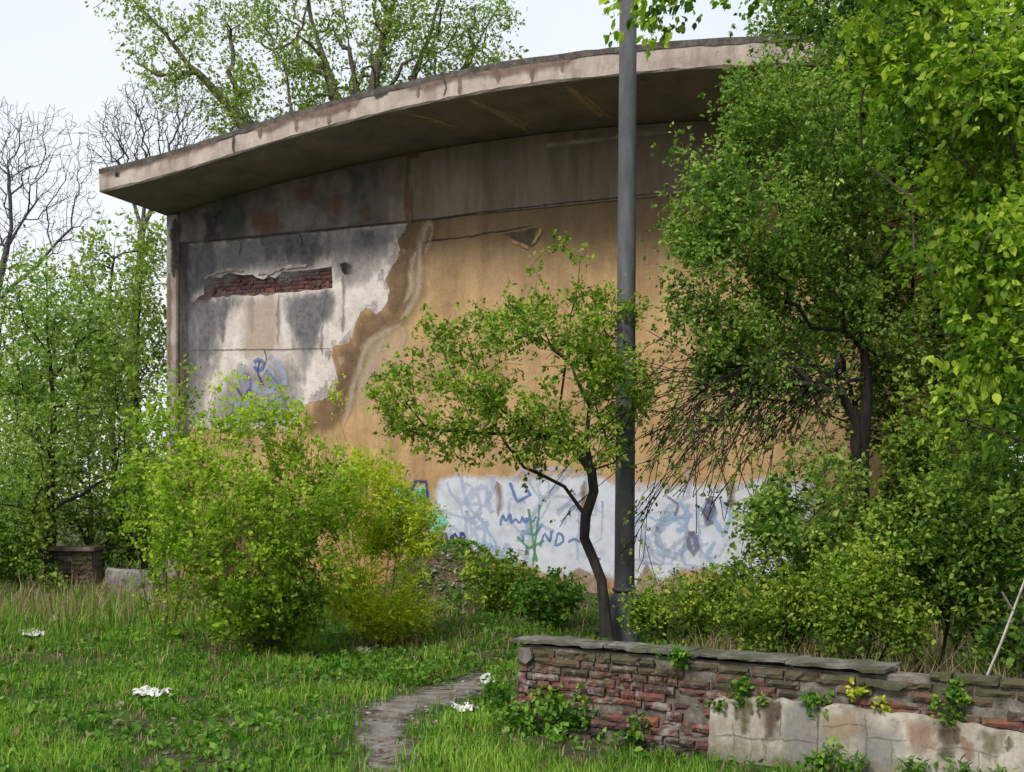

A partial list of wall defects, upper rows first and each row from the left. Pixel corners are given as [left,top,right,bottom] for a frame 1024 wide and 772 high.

damp [187,211,391,423]
peeling [187,223,408,429]
damp [311,219,433,429]
spalling [505,228,543,249]